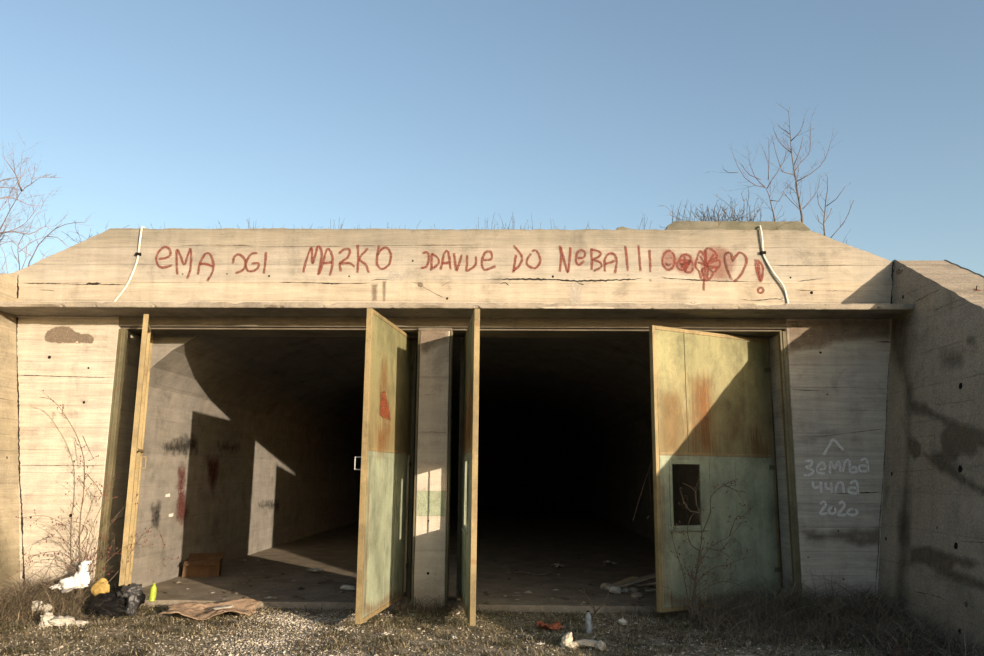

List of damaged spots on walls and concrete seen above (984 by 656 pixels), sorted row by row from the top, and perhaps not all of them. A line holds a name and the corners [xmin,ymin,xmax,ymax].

leakage [912,403,984,492]
leakage [903,544,984,588]